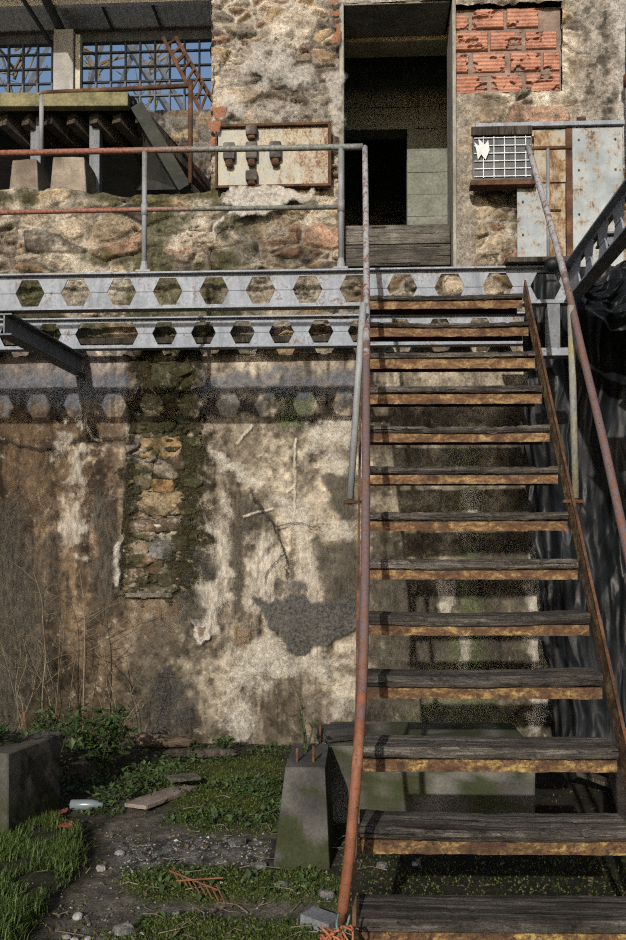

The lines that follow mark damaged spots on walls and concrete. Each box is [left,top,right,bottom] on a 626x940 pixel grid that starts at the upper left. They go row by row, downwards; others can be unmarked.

corrosion [534,130,566,256]
water stain [0,370,125,407]
water stain [0,506,57,731]
peeling [59,503,87,544]
water stain [91,493,117,618]
spalling [113,343,203,607]